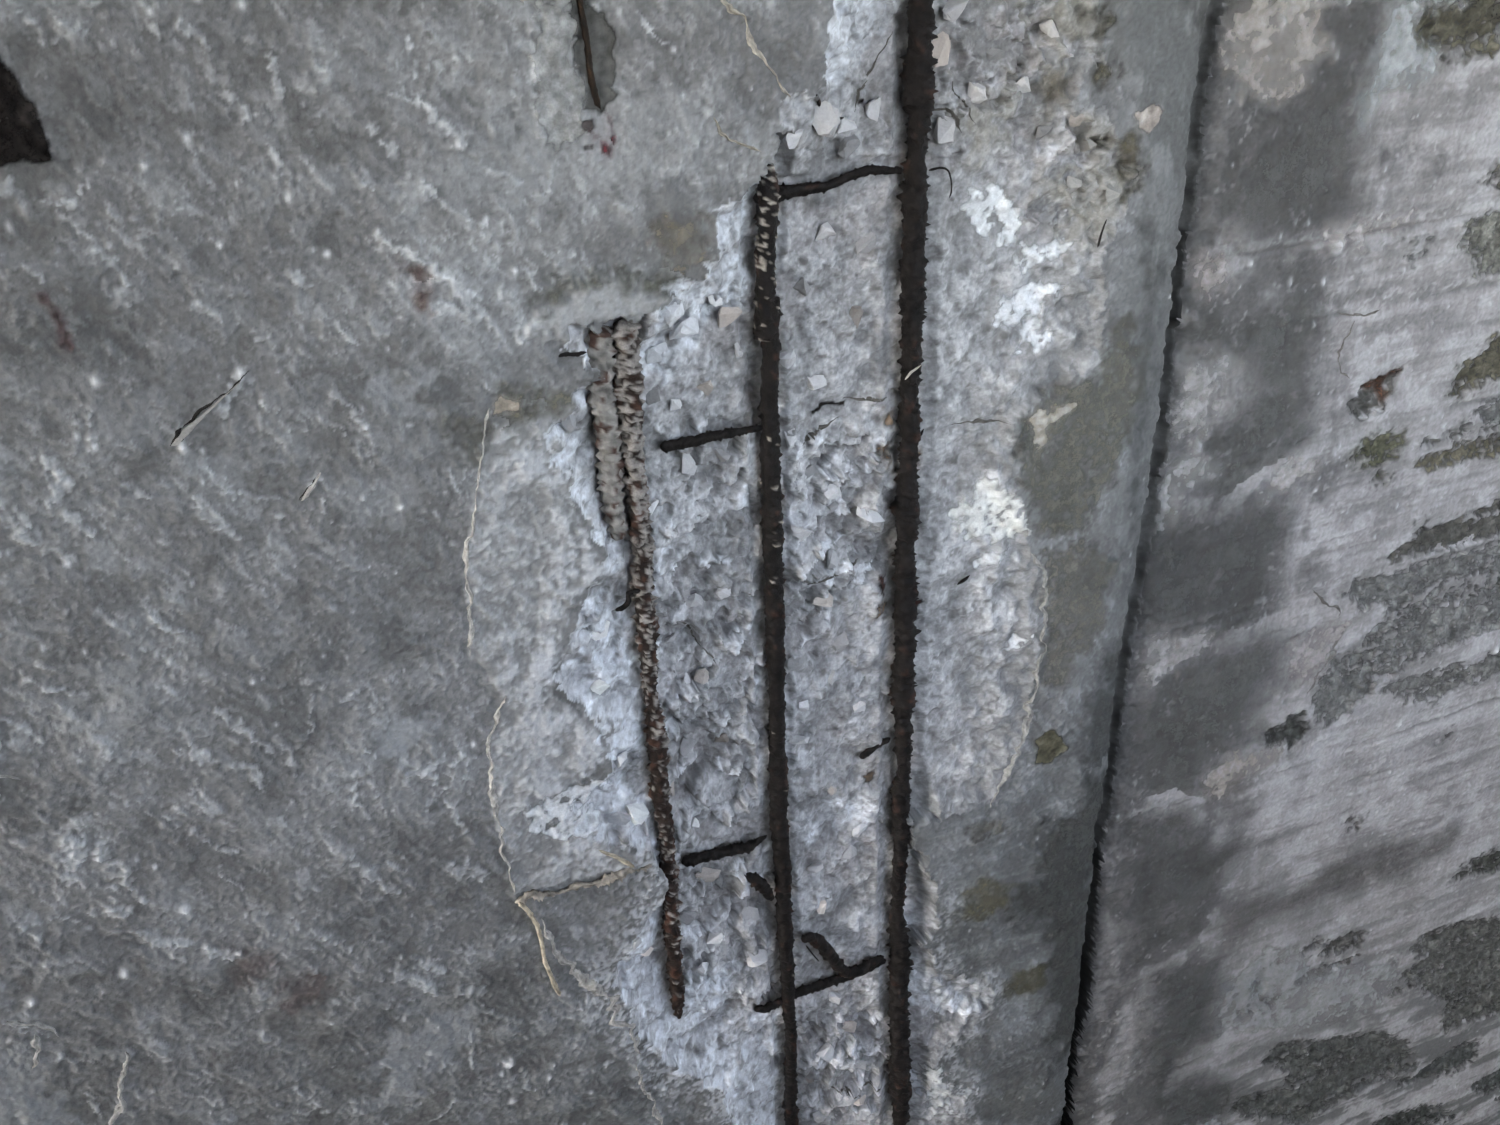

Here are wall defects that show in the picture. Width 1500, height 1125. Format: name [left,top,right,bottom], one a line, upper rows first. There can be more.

spalling [530,0,618,152]
corrosion [601,135,616,156]
water stain [1230,56,1378,232]
water stain [1183,294,1319,493]
spalling [544,0,1147,1125]
corrosion [875,576,887,619]
water stain [1128,500,1293,947]
water stain [1228,838,1451,937]
water stain [1139,959,1235,1125]